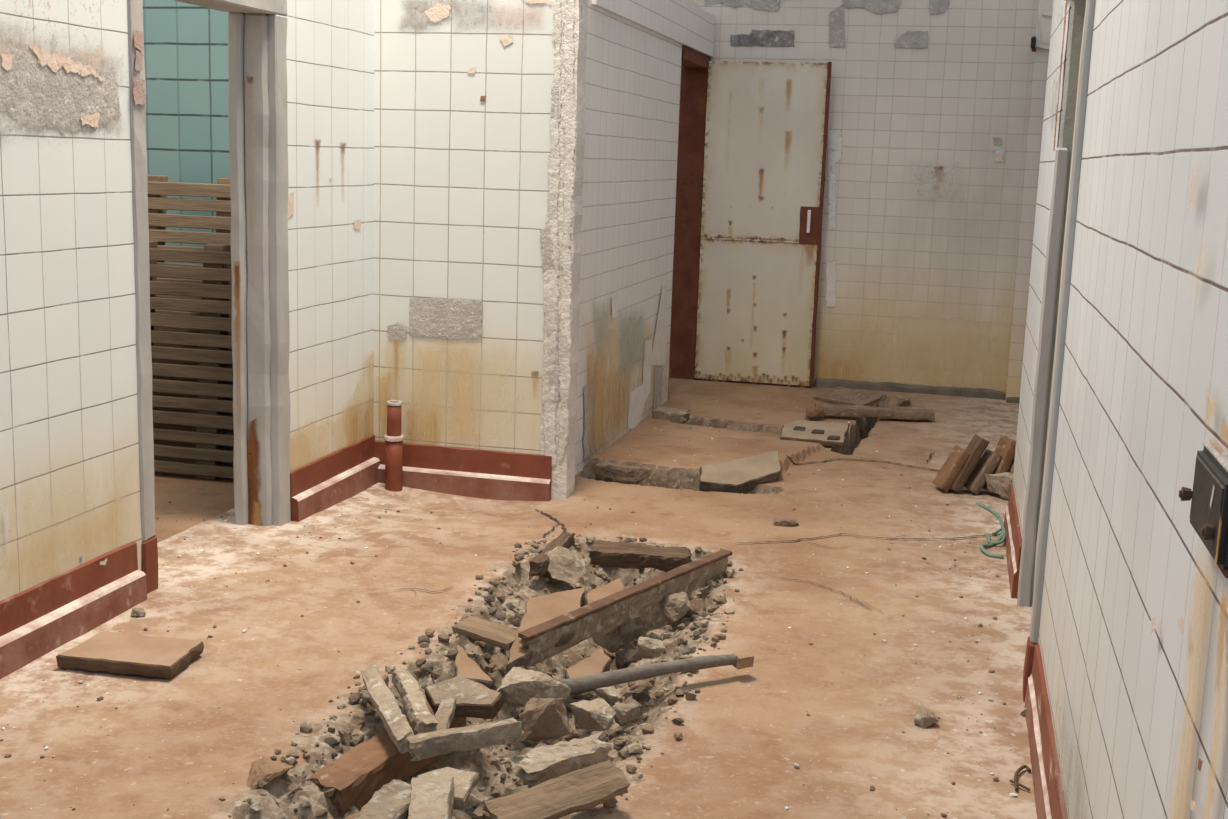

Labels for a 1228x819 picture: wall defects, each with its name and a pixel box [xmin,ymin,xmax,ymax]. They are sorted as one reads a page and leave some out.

flaking render [0,28,147,134]
peeling [829,0,901,47]
peeling [894,30,928,49]
peeling [929,0,949,15]
spalling [387,0,598,466]
corrosion [247,420,260,526]